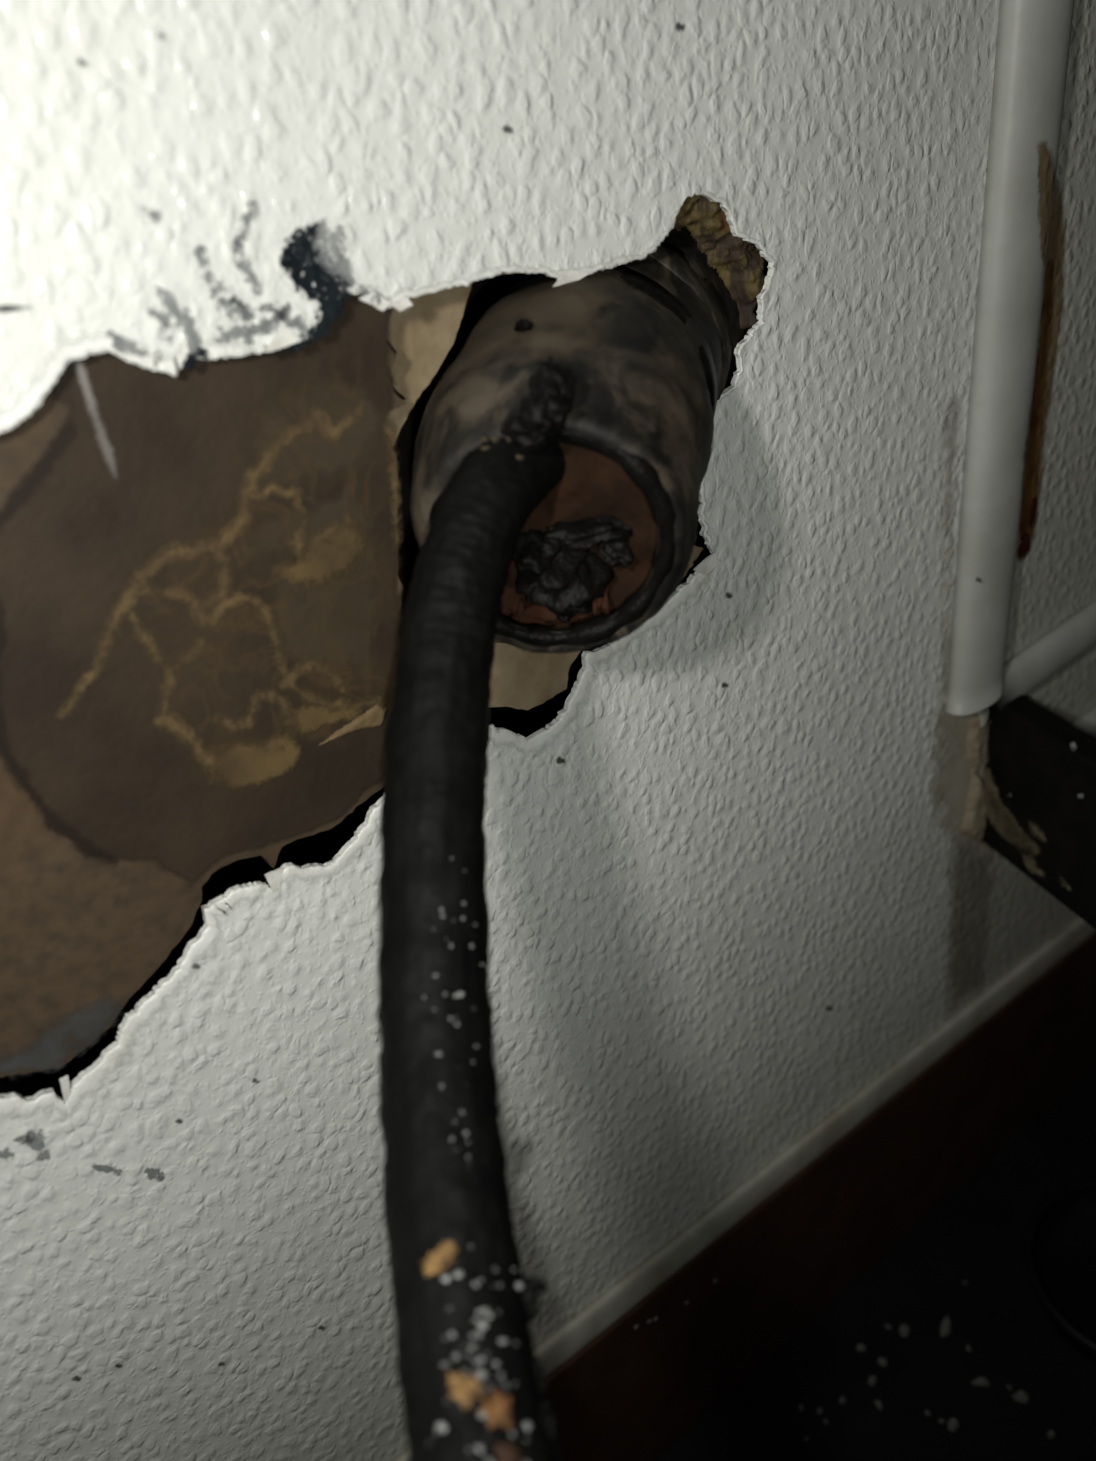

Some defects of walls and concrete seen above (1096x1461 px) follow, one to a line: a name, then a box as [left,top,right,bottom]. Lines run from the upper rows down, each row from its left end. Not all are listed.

peeling [550,270,593,287]
peeling [359,291,413,312]
peeling [264,327,300,352]
peeling [693,553,721,575]
peeling [264,868,282,892]